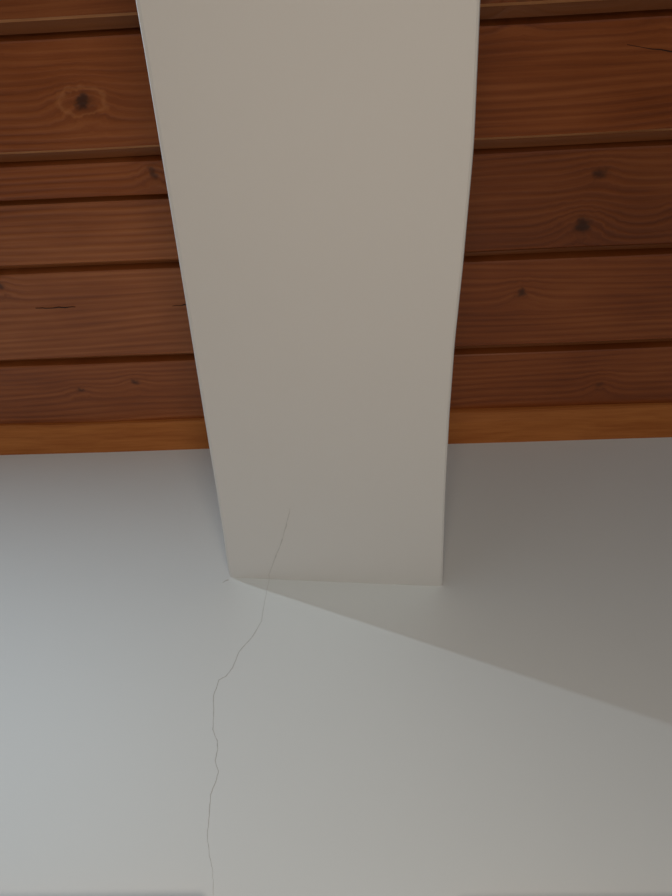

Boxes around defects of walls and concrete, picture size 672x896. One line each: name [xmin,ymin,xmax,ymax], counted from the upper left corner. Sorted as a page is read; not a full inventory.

crack [207,511,290,878]